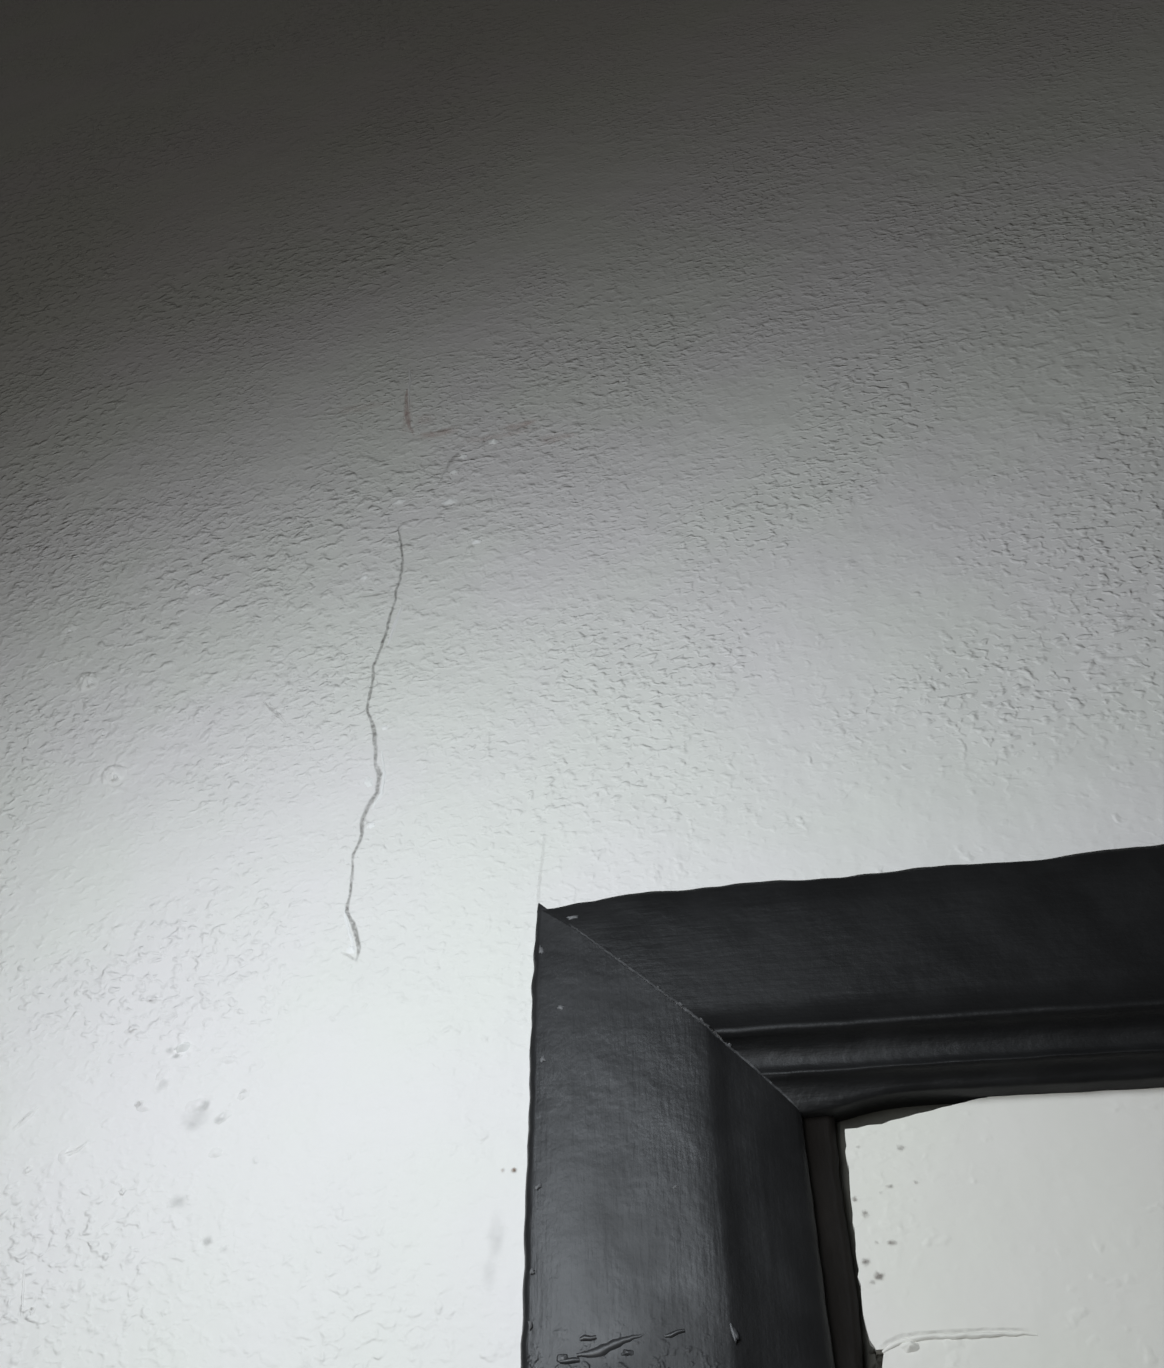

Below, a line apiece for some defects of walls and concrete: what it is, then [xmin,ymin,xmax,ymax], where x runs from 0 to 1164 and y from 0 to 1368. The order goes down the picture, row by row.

crack [364,605,402,828]
crack [344,884,356,954]